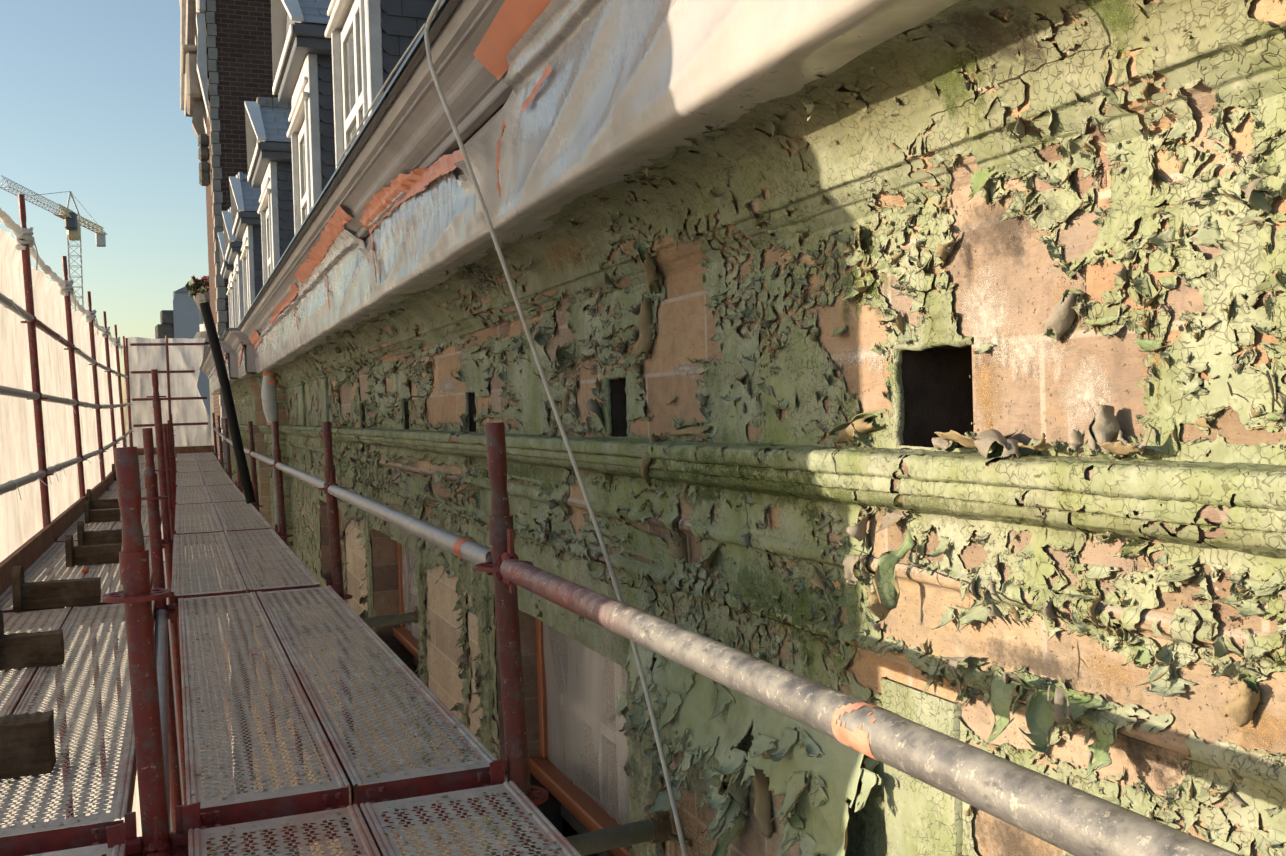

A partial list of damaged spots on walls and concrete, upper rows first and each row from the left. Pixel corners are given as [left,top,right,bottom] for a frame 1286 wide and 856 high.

crack [931,0,1110,116]
peeling [1119,0,1158,51]
peeling [304,74,1286,458]
crack [1227,351,1285,423]
crack [1035,504,1054,540]
peeling [332,441,498,758]
peeling [507,464,1286,856]